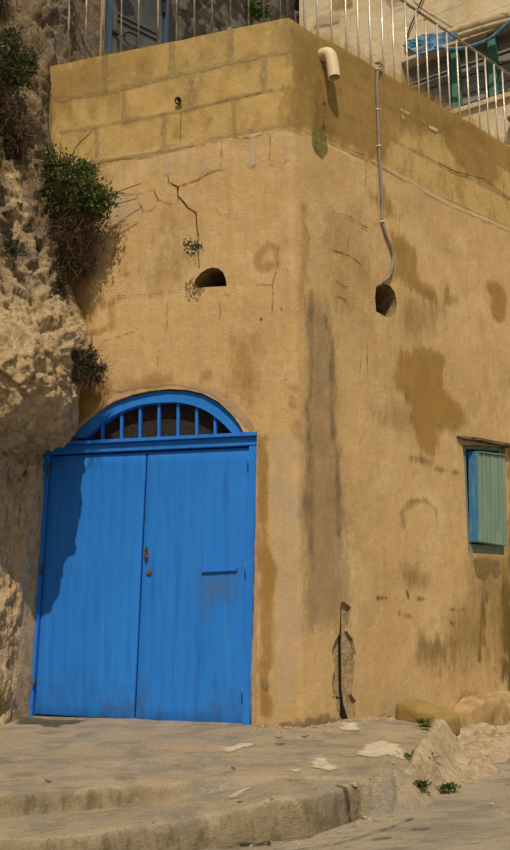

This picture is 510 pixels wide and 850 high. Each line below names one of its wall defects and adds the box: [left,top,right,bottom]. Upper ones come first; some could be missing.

crack [97,92,301,268]
water stain [489,283,507,321]
water stain [396,346,462,452]
water stain [259,437,268,521]
water stain [259,546,275,714]
crack [331,601,357,721]
water stain [474,555,510,691]
water stain [17,717,82,727]